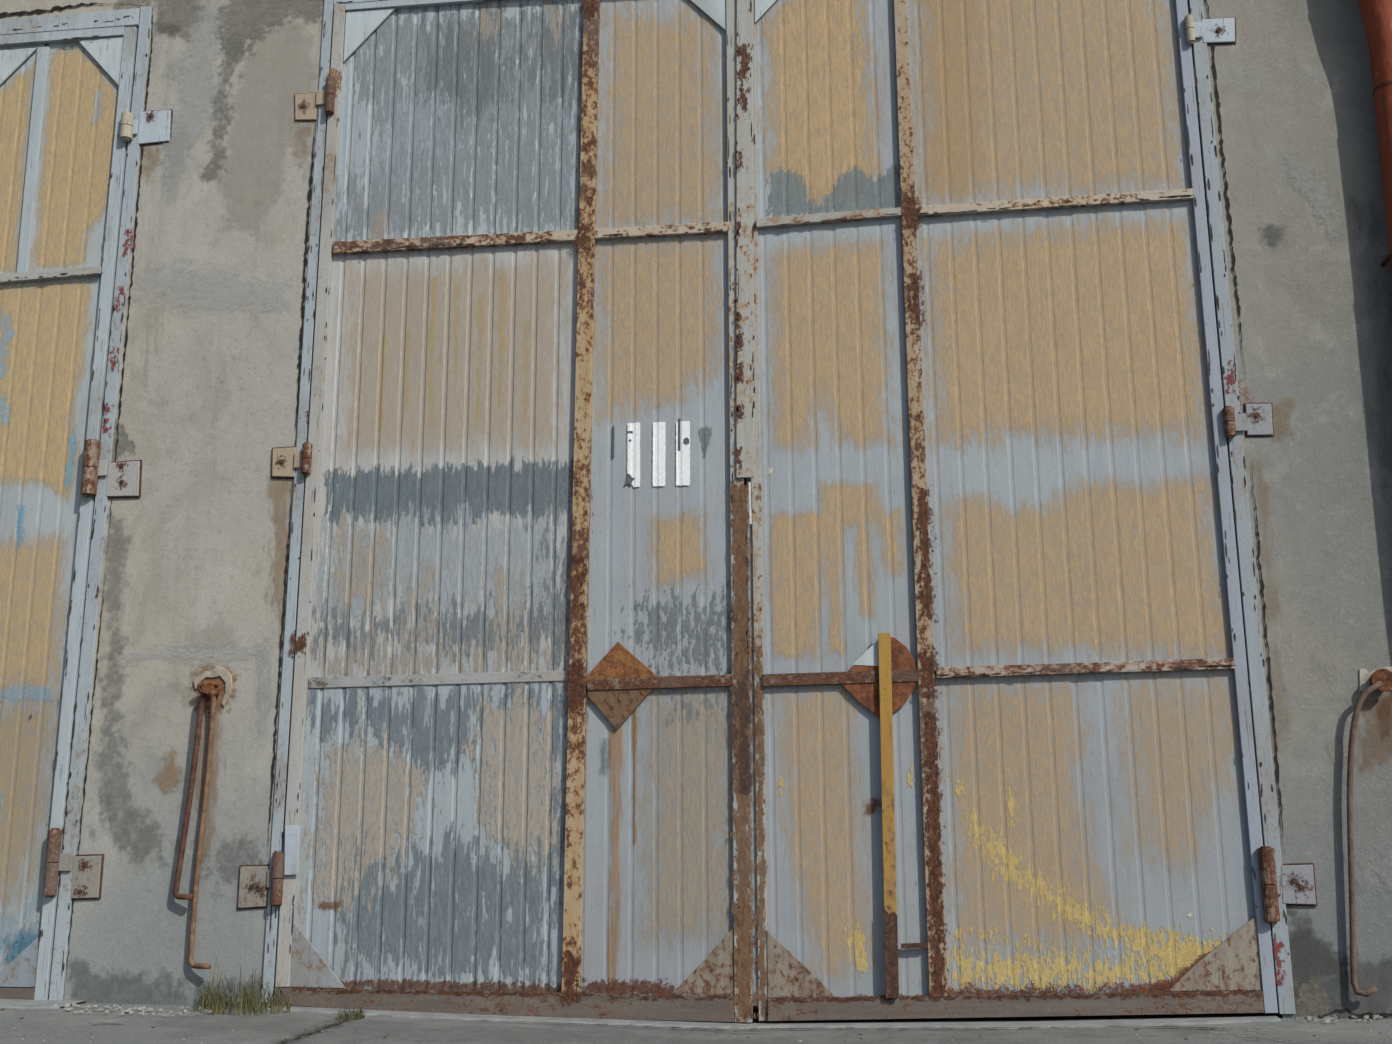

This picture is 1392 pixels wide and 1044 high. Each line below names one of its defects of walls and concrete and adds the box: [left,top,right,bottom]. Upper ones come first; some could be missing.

leakage [114,0,324,180]
peeling [308,0,598,262]
corrosion [735,43,753,120]
corrosion [733,312,744,383]
corrosion [906,268,927,328]
leakage [98,632,159,860]
peeling [242,456,574,989]
peeling [614,562,734,733]
corrosion [288,447,1263,1024]
crack [277,1018,349,1044]
peeling [946,778,1234,995]
leakage [1289,910,1392,1019]